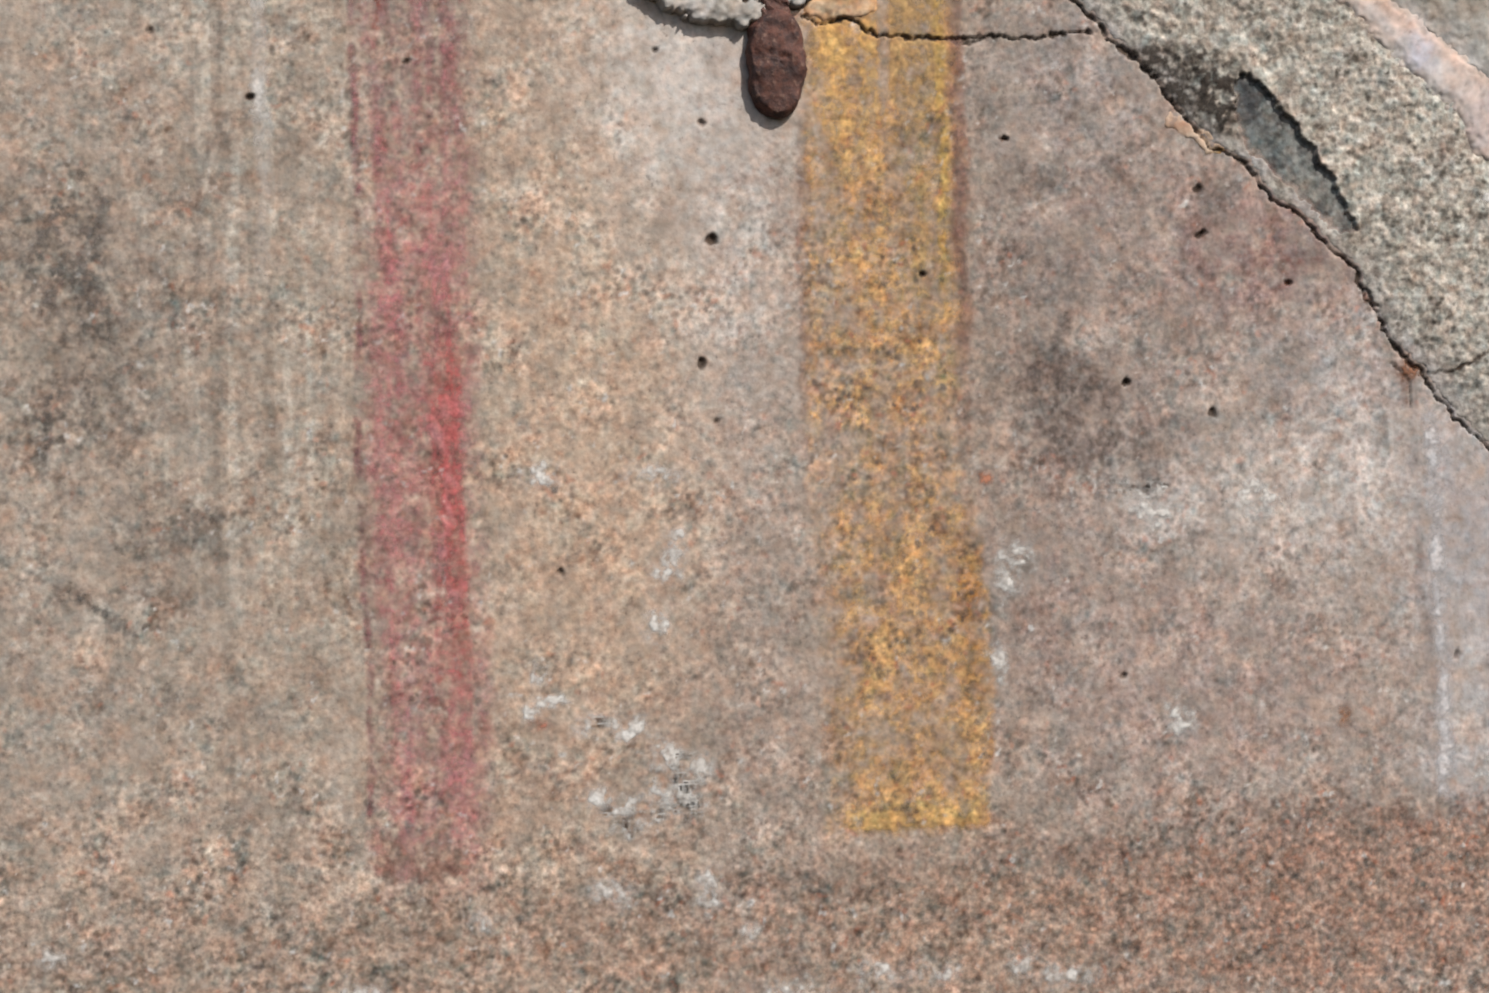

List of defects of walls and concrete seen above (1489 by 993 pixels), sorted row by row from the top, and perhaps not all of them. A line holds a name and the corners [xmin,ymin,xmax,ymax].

crack [790,2,1489,451]
spalling [1234,73,1352,232]